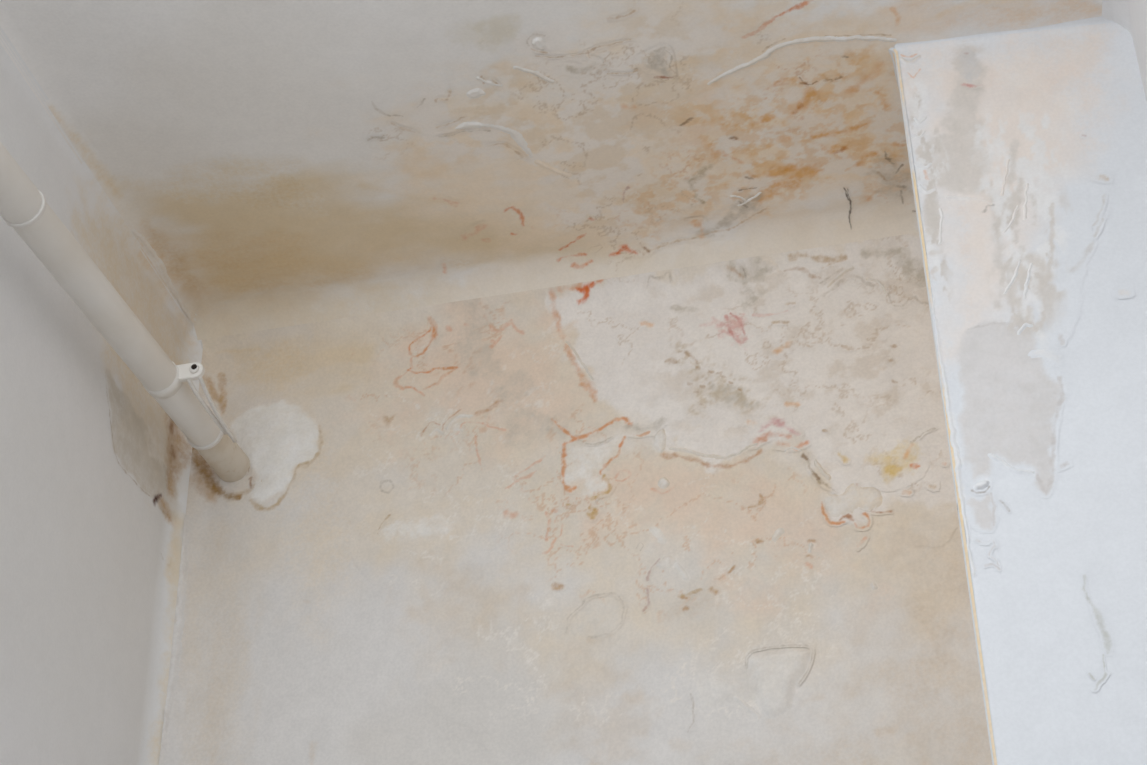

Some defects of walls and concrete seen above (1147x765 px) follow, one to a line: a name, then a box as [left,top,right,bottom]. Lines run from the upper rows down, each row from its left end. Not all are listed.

damp [45,0,849,365]
damp [164,262,993,765]
peeling [514,52,1073,555]
damp [718,229,881,316]
damp [869,0,1102,38]
damp [854,22,1146,765]